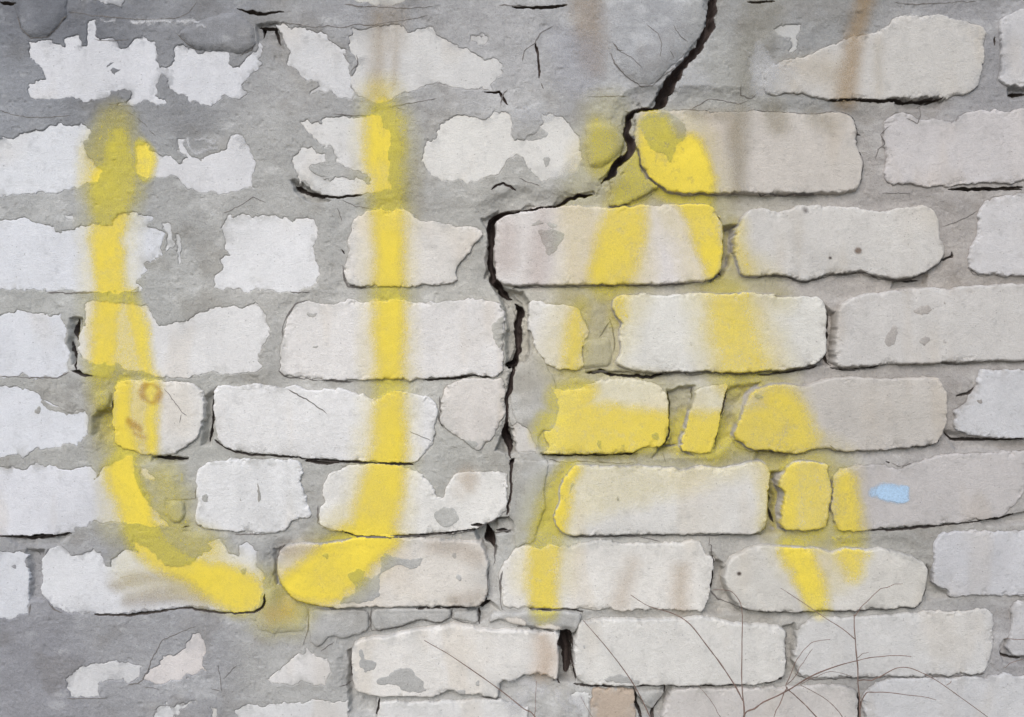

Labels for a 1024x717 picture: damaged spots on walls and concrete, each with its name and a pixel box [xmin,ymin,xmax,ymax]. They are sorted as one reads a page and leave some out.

peeling [28,20,263,107]
peeling [147,134,256,195]
peeling [292,116,387,197]
peeling [422,112,582,184]
crack [369,0,755,631]
peeling [66,633,206,698]
peeling [268,648,331,686]
crack [557,629,572,671]